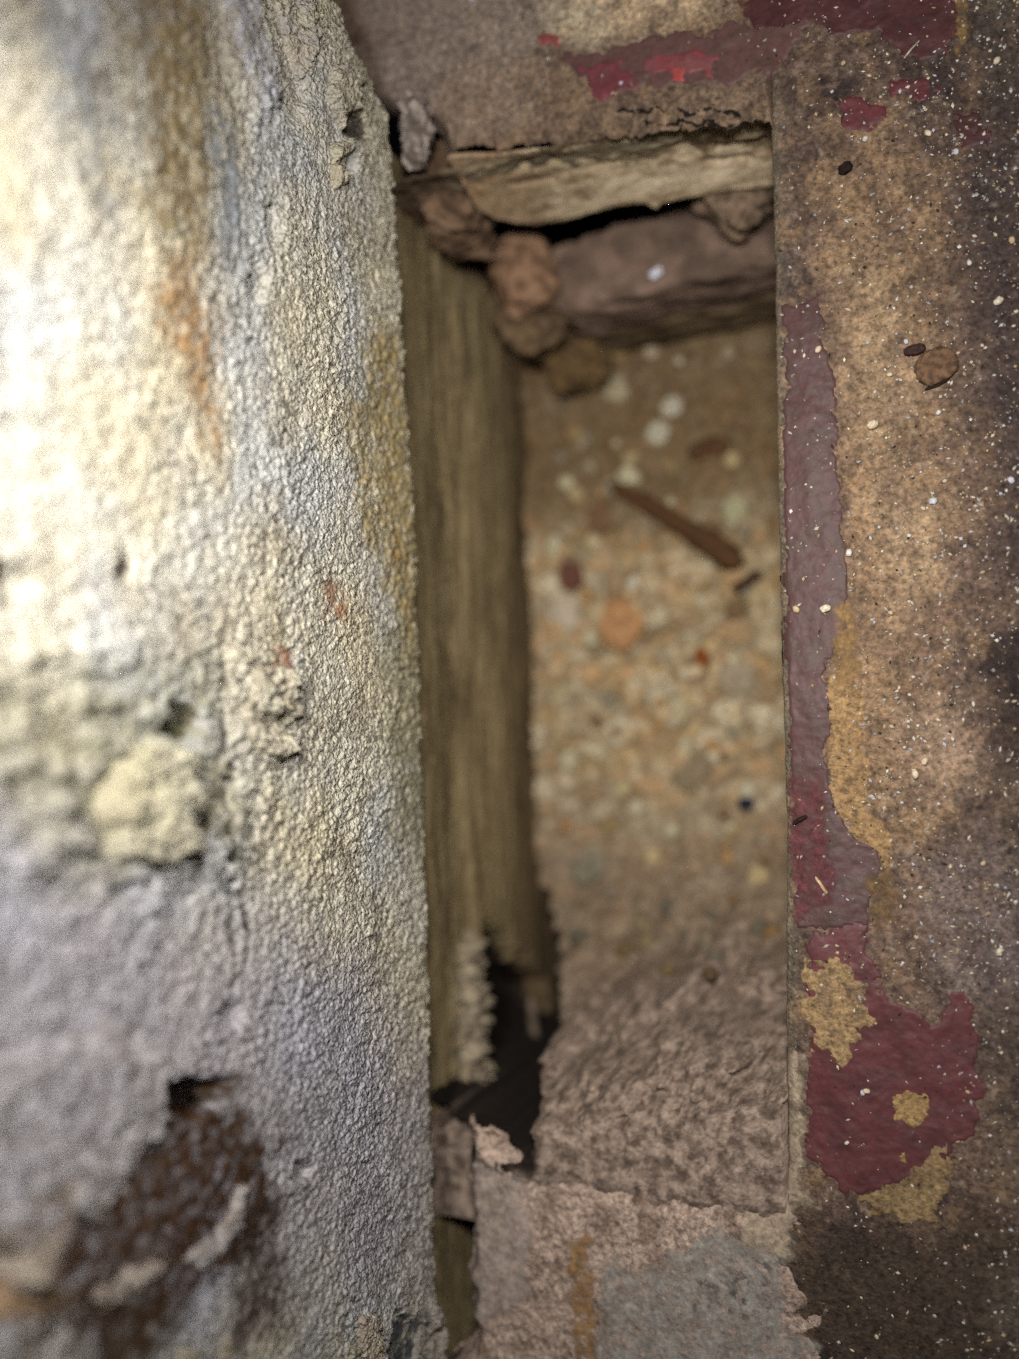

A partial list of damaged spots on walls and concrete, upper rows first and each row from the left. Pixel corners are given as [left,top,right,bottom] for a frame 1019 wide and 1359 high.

peeling [536,0,969,102]
peeling [837,78,941,133]
peeling [953,110,993,149]
spalling [155,701,199,747]
peeling [780,294,989,1224]
spalling [198,802,214,836]